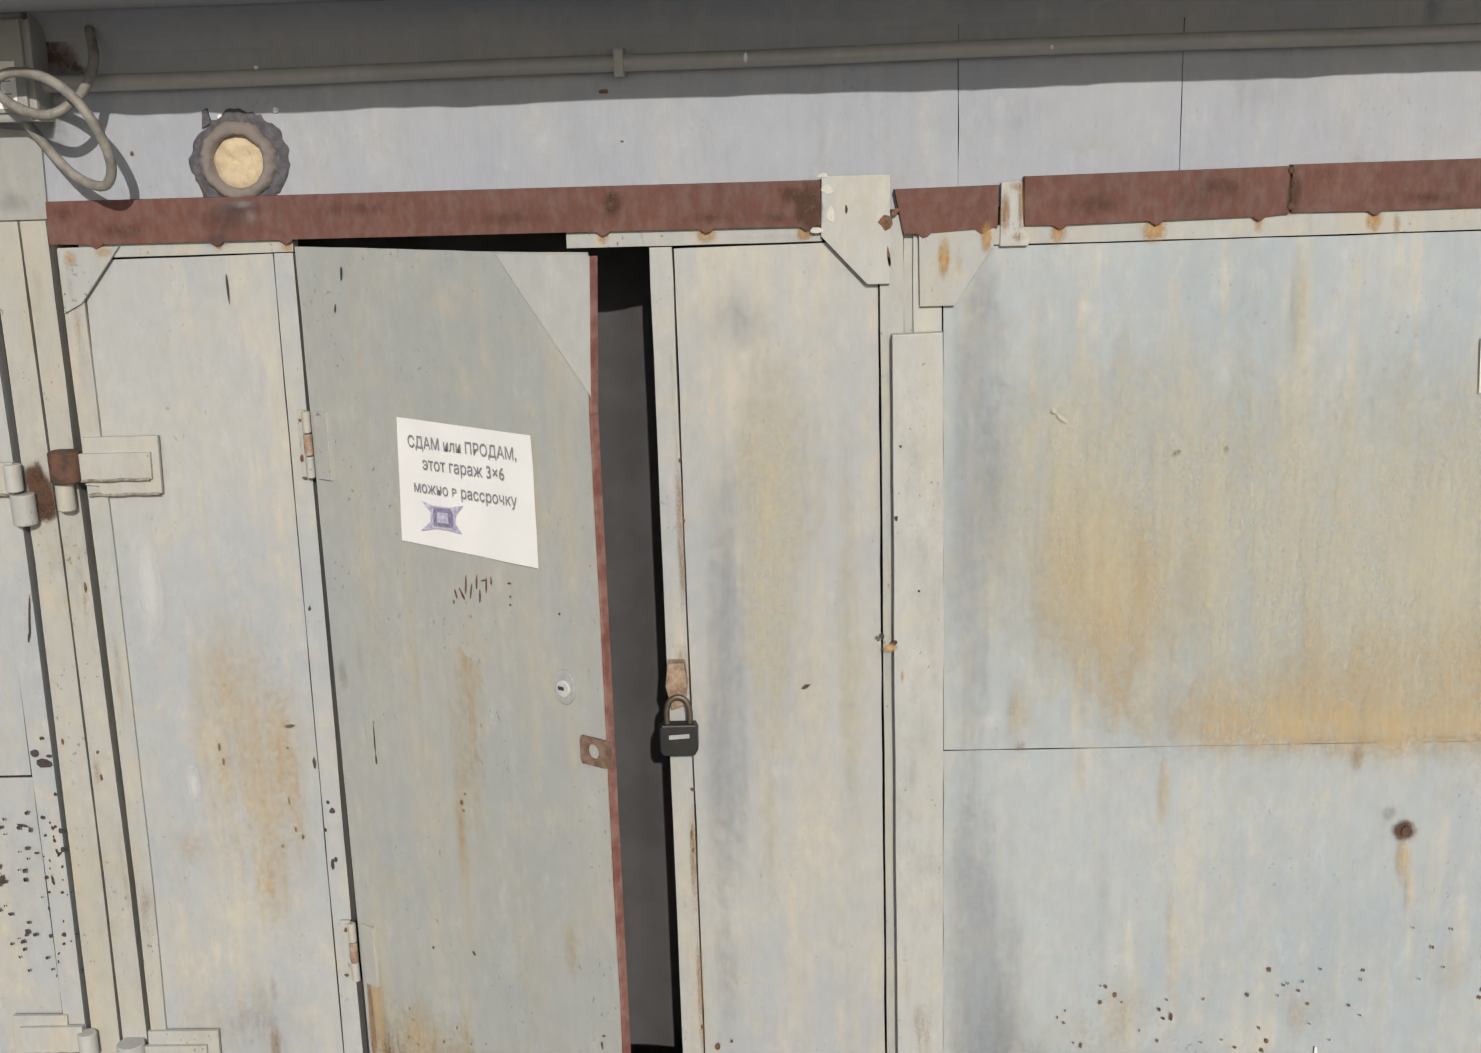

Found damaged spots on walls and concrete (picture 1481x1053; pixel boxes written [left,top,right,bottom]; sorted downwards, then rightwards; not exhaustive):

corrosion [786,188,820,238]
corrosion [940,246,949,272]
corrosion [1396,821,1414,862]